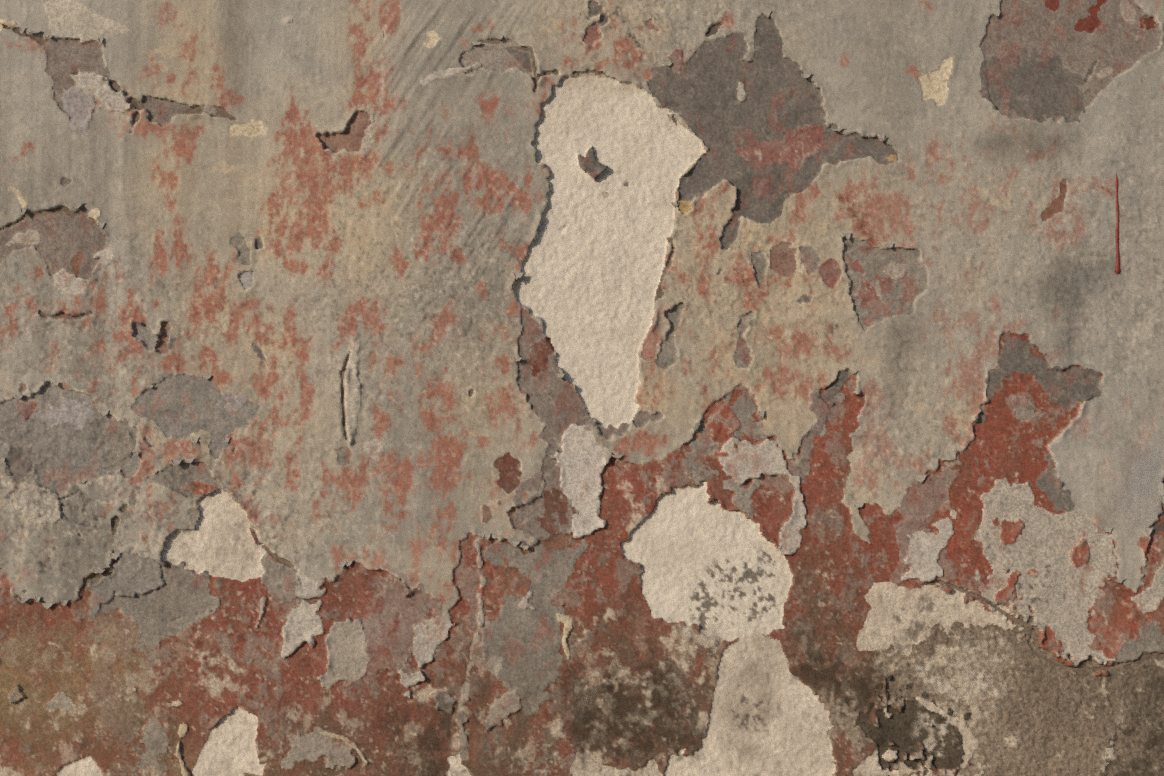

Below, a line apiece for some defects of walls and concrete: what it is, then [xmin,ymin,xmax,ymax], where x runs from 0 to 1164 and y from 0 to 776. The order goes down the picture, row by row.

peeling [44,0,190,137]
peeling [979,0,1161,123]
peeling [0,187,114,295]
peeling [133,322,171,354]
spalling [495,11,898,542]
peeling [751,233,928,331]
peeling [0,331,1164,776]